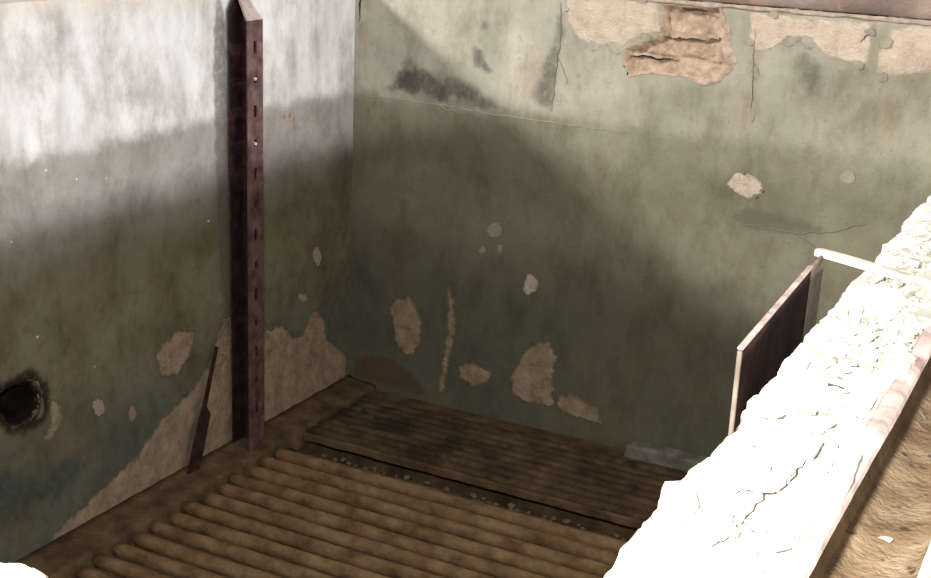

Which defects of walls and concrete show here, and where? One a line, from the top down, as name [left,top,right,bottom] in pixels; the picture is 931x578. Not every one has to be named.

damp [400,68,491,106]
crack [357,2,625,133]
flaking render [561,0,737,86]
flaking render [746,11,931,82]
flaking render [727,171,763,199]
flaking render [264,308,347,422]
flaking render [388,294,425,359]
flaking render [438,285,492,395]
flaking render [509,339,603,425]
flaking render [49,315,232,543]
flaking render [658,481,698,526]
crack [706,455,823,553]